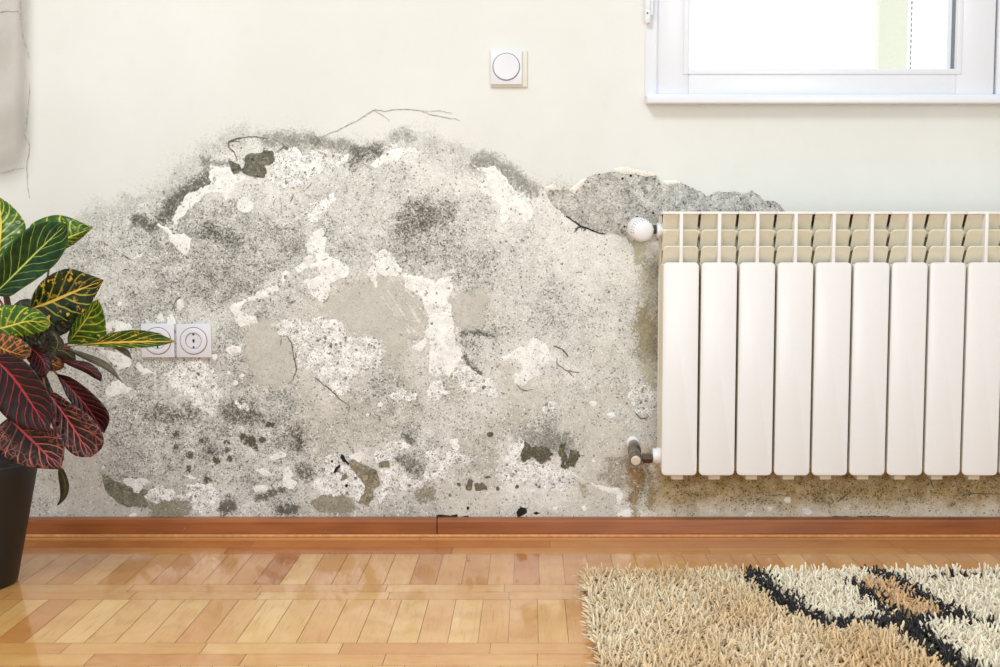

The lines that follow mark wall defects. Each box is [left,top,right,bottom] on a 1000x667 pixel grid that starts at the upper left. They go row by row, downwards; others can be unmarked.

crack [316,109,458,139]
leakage [131,170,216,232]
crack [566,216,604,234]
peeling [29,126,785,521]
leakage [629,241,658,388]
leakage [146,403,202,474]
leakage [199,399,275,465]
leakage [284,420,314,483]
leakage [521,433,580,469]
leakage [217,495,237,516]
leakage [255,487,299,517]
leakage [448,476,500,497]